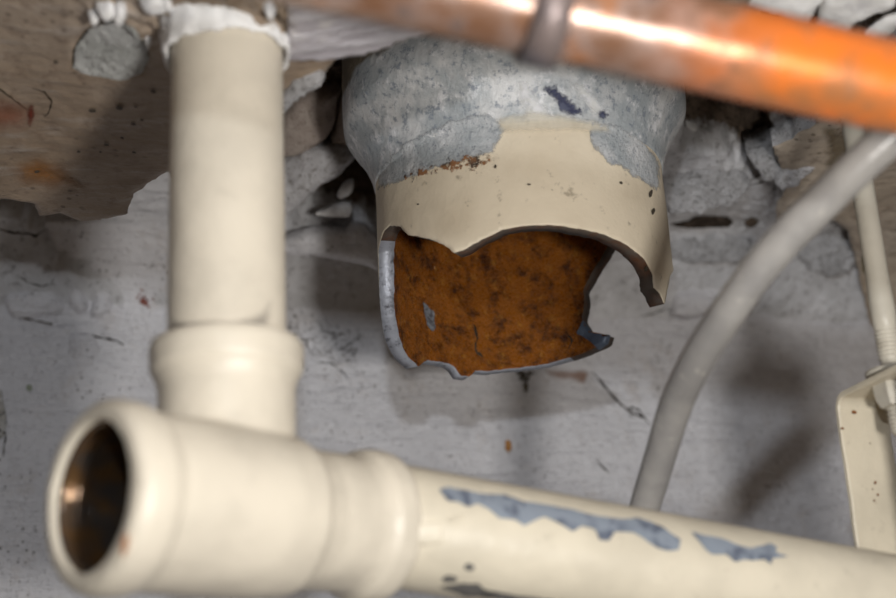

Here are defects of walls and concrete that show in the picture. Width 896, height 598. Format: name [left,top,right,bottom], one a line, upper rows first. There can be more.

peeling [748,0,896,36]
spalling [73,21,149,81]
peeling [283,4,429,114]
crack [0,87,53,116]
peeling [544,87,581,115]
peeling [315,178,354,217]
crack [593,373,650,424]